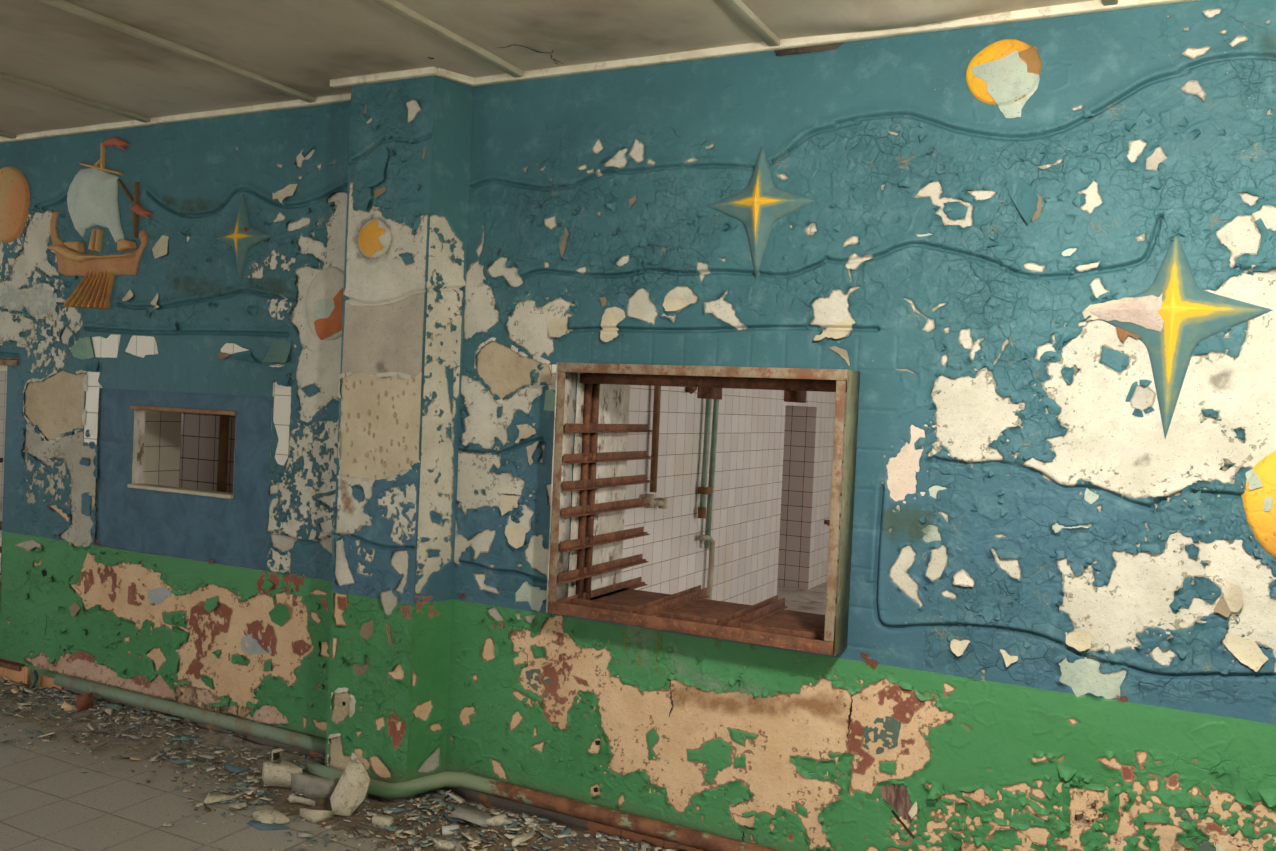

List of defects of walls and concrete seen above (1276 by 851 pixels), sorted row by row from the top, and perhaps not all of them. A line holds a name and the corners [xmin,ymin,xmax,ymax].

peeling [406,100,421,123]
peeling [578,139,656,177]
peeling [1107,116,1201,197]
peeling [611,253,634,270]
peeling [597,258,748,342]
peeling [789,218,817,235]
peeling [805,236,873,366]
peeling [0,146,584,780]
peeling [881,144,1276,701]
peeling [474,573,1276,851]